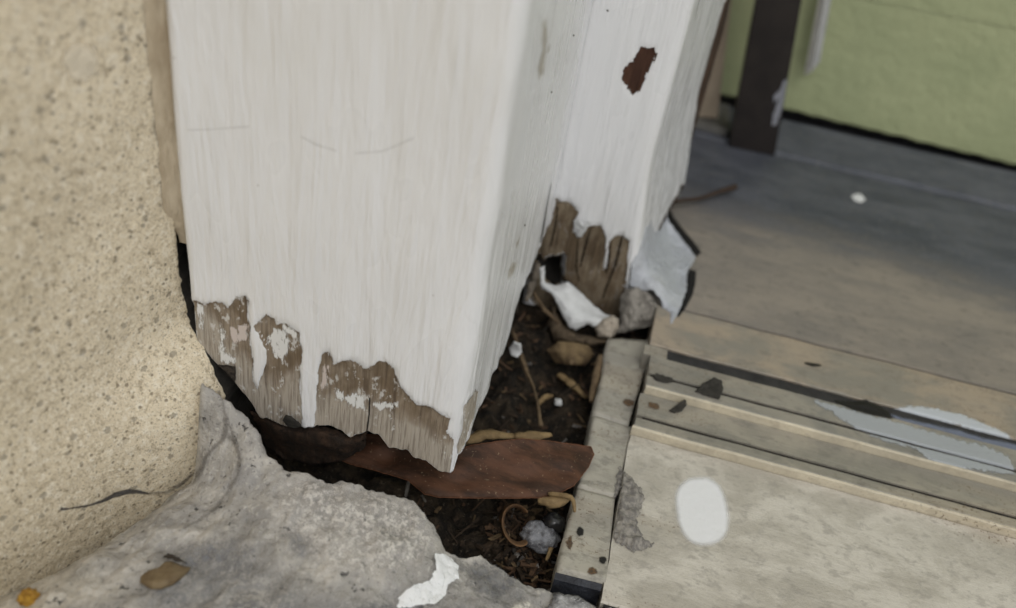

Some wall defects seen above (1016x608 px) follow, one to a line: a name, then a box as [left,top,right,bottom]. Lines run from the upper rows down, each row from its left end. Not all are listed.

peeling [622,47,658,95]
peeling [527,198,629,318]
peeling [193,295,302,428]
peeling [314,352,478,473]
crack [61,489,148,511]